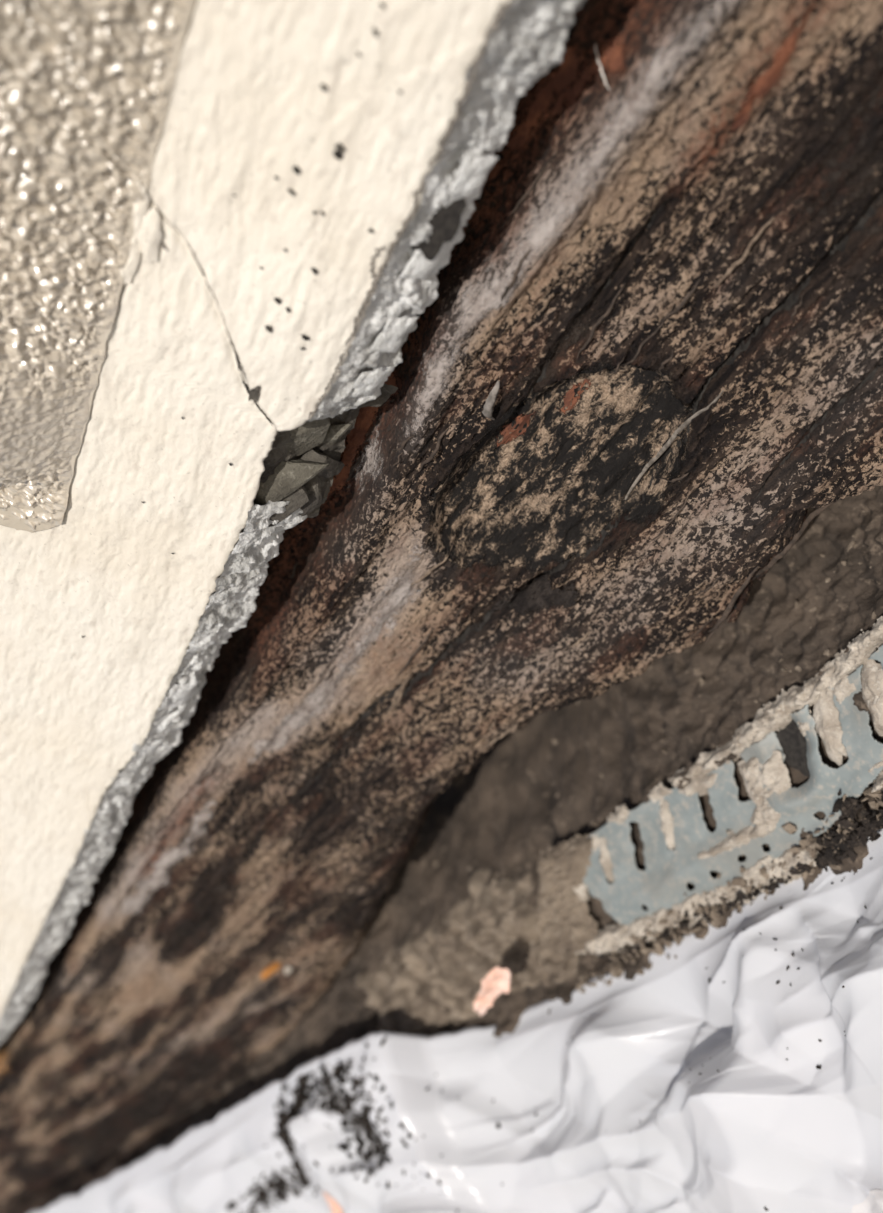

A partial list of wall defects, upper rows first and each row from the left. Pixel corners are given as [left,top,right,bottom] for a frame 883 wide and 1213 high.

crack [149,200,272,425]
spalling [0,0,585,1043]
spalling [868,771,883,793]
spalling [575,848,819,955]